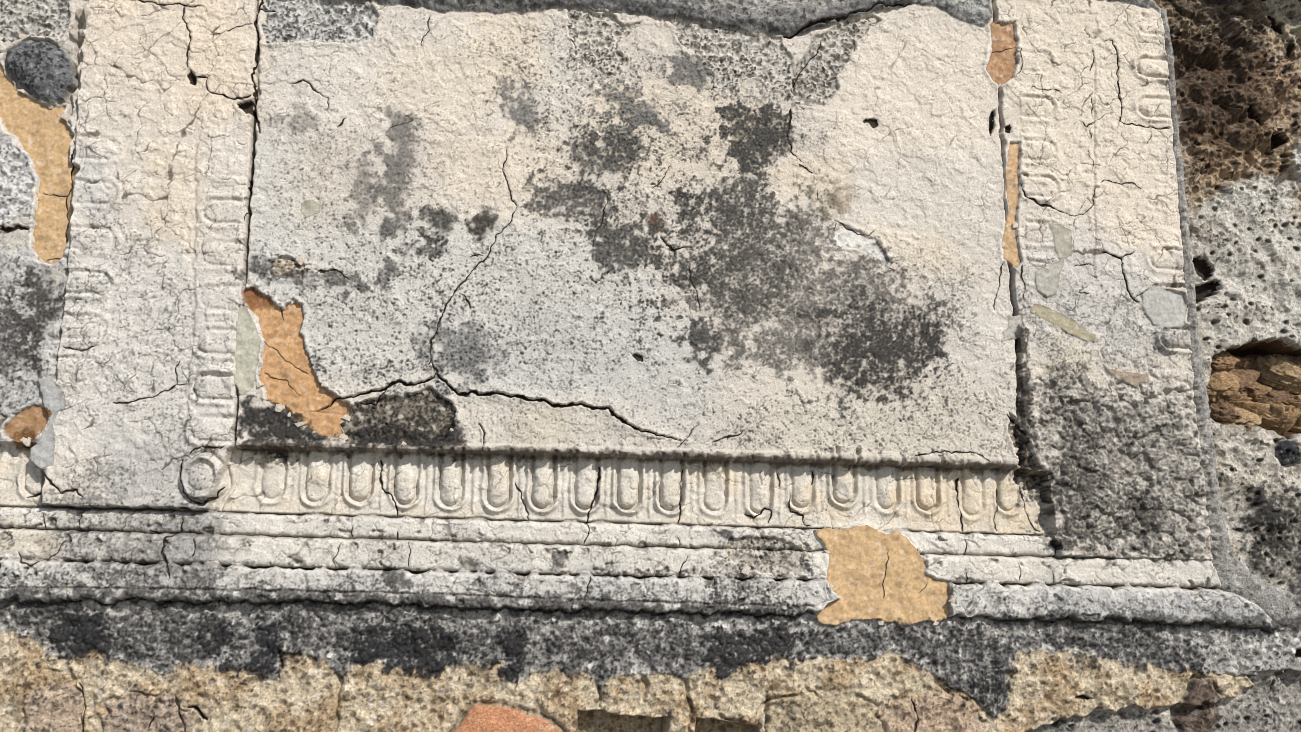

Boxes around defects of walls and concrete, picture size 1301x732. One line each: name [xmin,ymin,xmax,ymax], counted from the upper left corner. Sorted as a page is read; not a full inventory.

peeling [0,65,80,264]
crack [130,0,276,220]
peeling [243,291,456,446]
crack [264,149,744,576]
water stain [486,78,540,141]
water stain [661,52,712,88]
water stain [524,80,953,418]
crack [1020,40,1169,216]
crack [1075,252,1147,305]
spalling [1207,339,1301,440]
water stain [0,477,1301,718]
peeling [814,525,957,626]